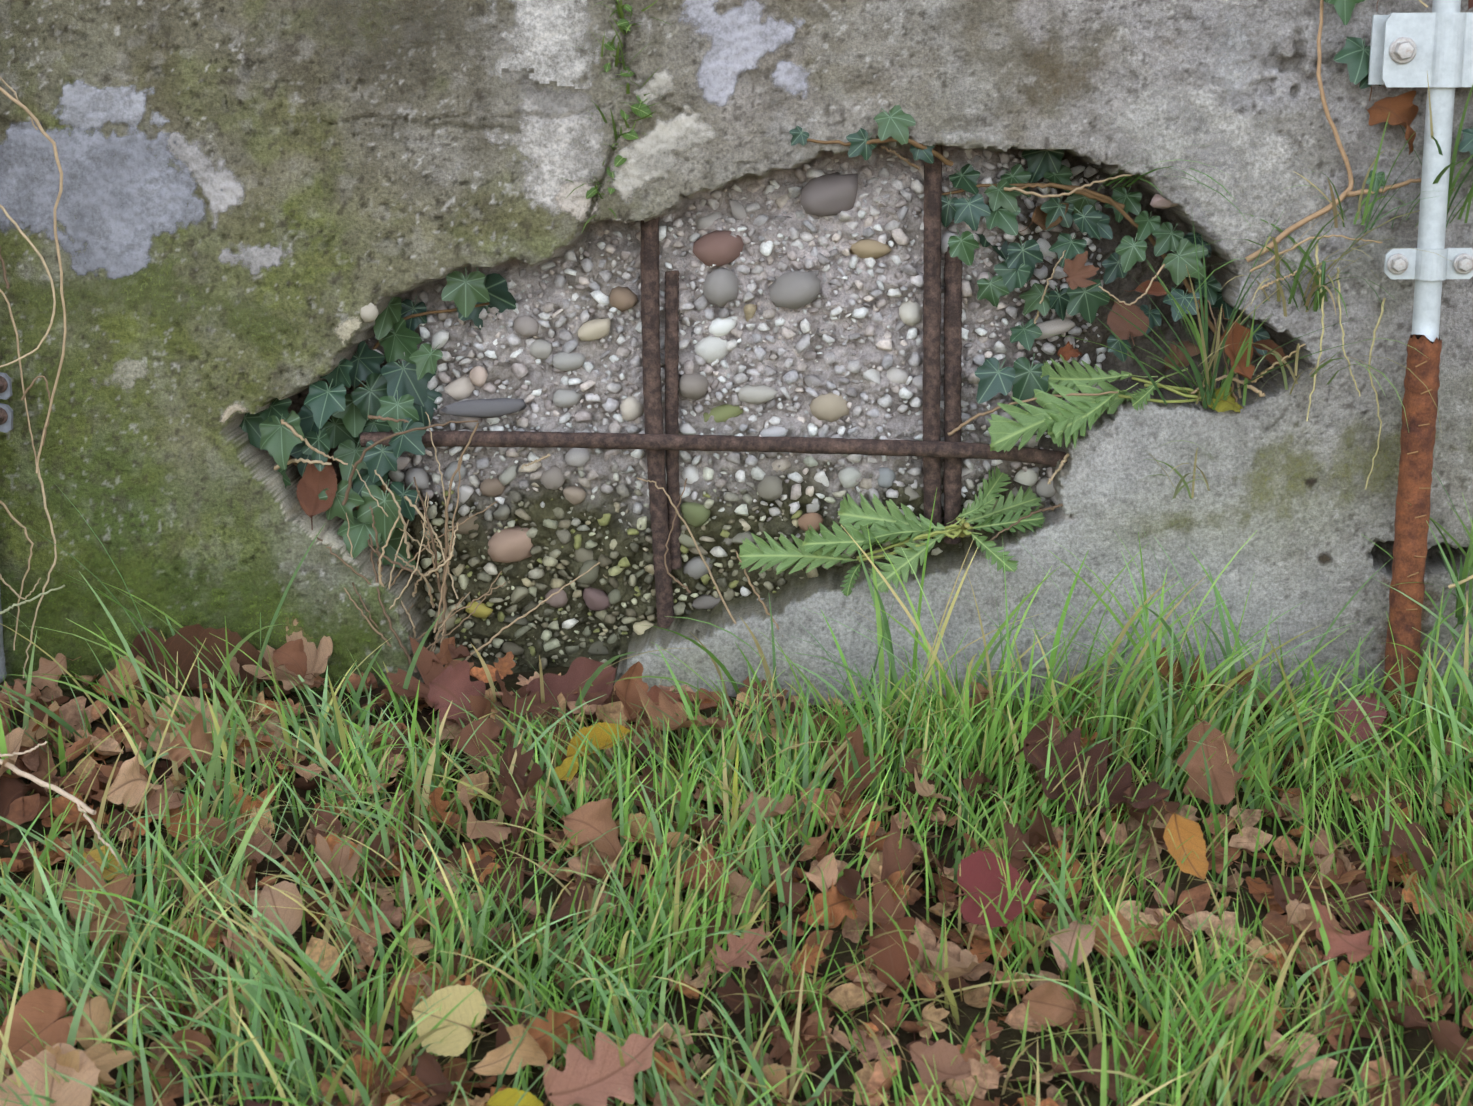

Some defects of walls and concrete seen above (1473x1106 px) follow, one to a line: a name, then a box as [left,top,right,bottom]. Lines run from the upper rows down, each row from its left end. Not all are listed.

peeling [0,80,244,279]
water stain [488,0,605,213]
water stain [94,359,147,388]
spalling [218,0,1326,685]
spalling [1367,538,1394,580]
corrosion [1383,334,1442,741]
spalling [1424,542,1470,576]